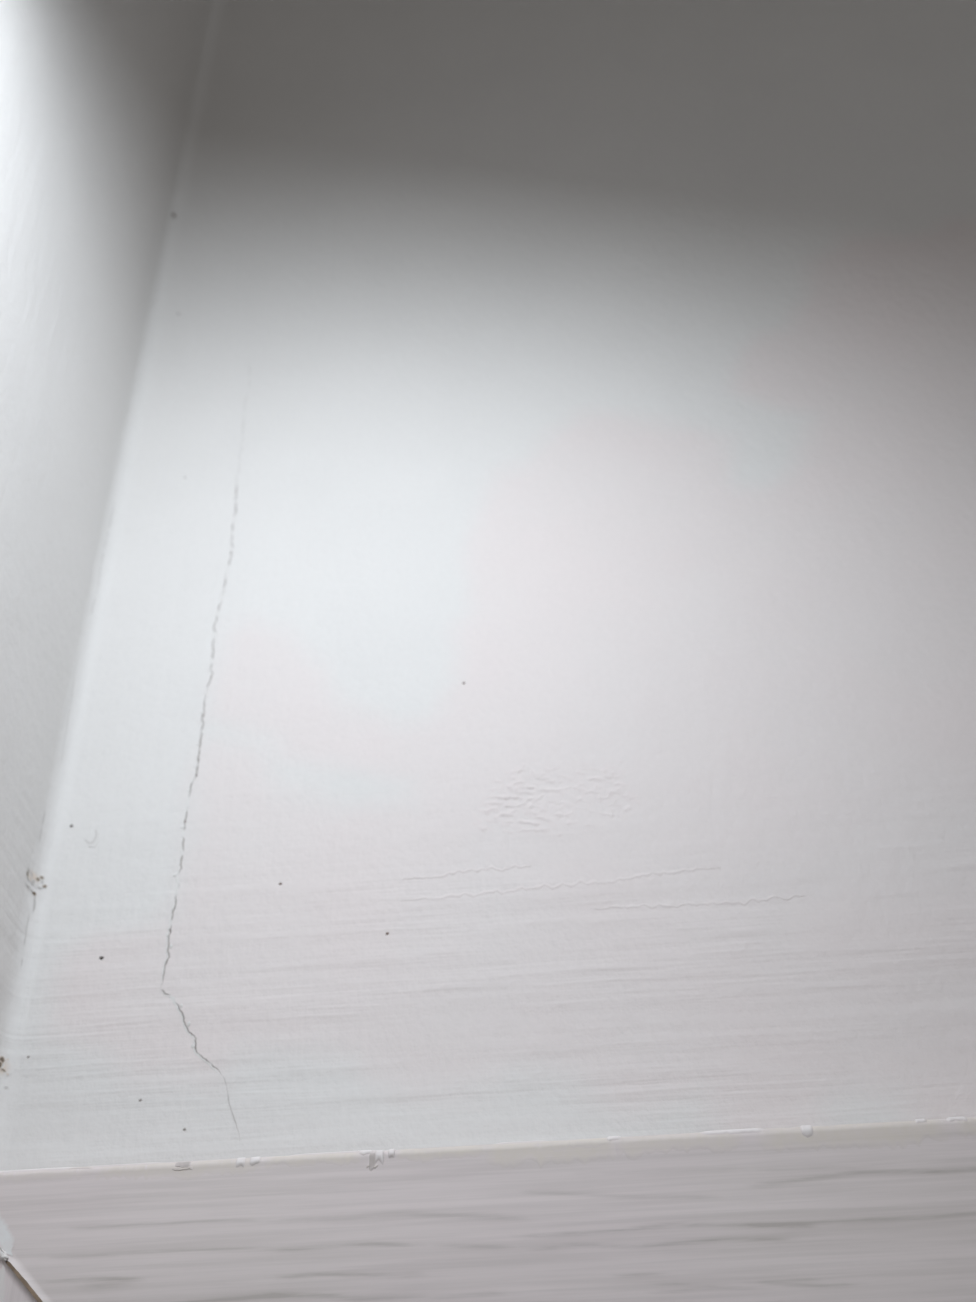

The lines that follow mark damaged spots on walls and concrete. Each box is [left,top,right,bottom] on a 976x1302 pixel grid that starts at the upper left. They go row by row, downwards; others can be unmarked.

crack [160,356,251,1142]